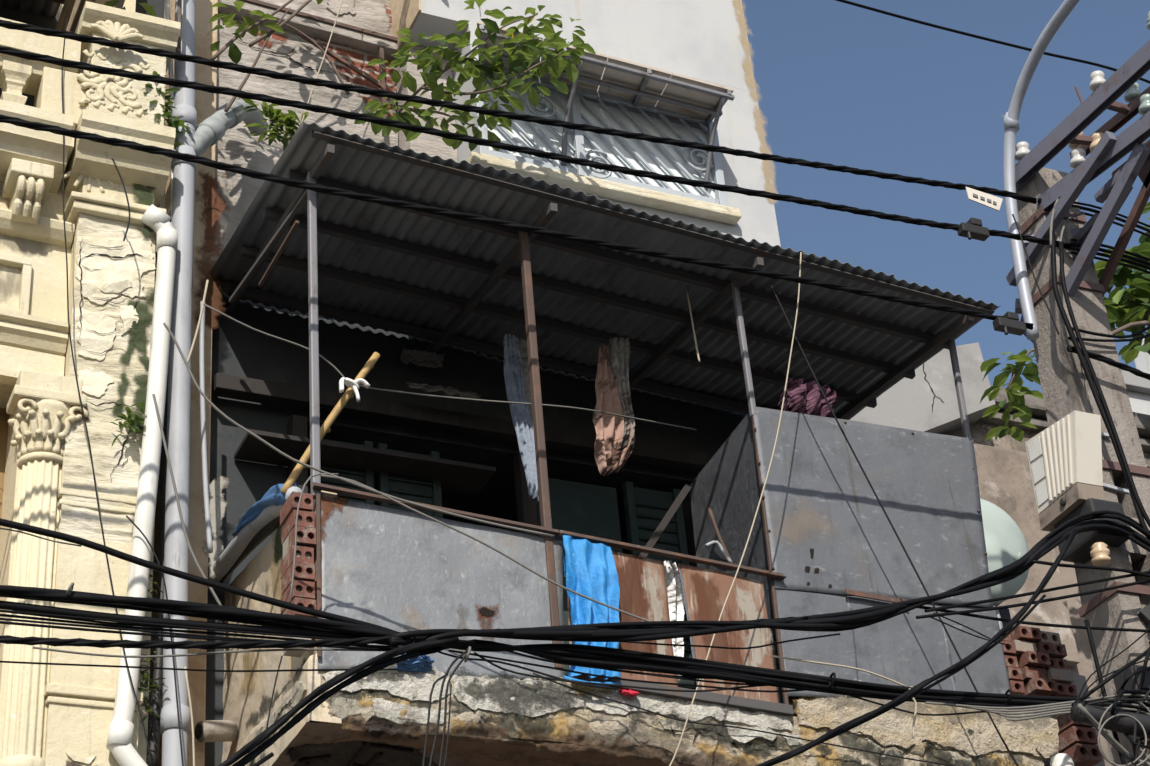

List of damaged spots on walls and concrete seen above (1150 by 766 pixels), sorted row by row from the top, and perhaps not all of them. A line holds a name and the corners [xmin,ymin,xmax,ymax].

flaking render [256,29,288,48]
peeling [326,0,356,16]
flaking render [315,38,397,117]
peeling [75,238,156,398]
corrosion [617,554,664,622]
corrosion [618,639,666,655]
corrosion [693,573,771,667]
peeling [252,681,307,746]
peeling [286,666,1059,766]
spalling [66,752,97,766]